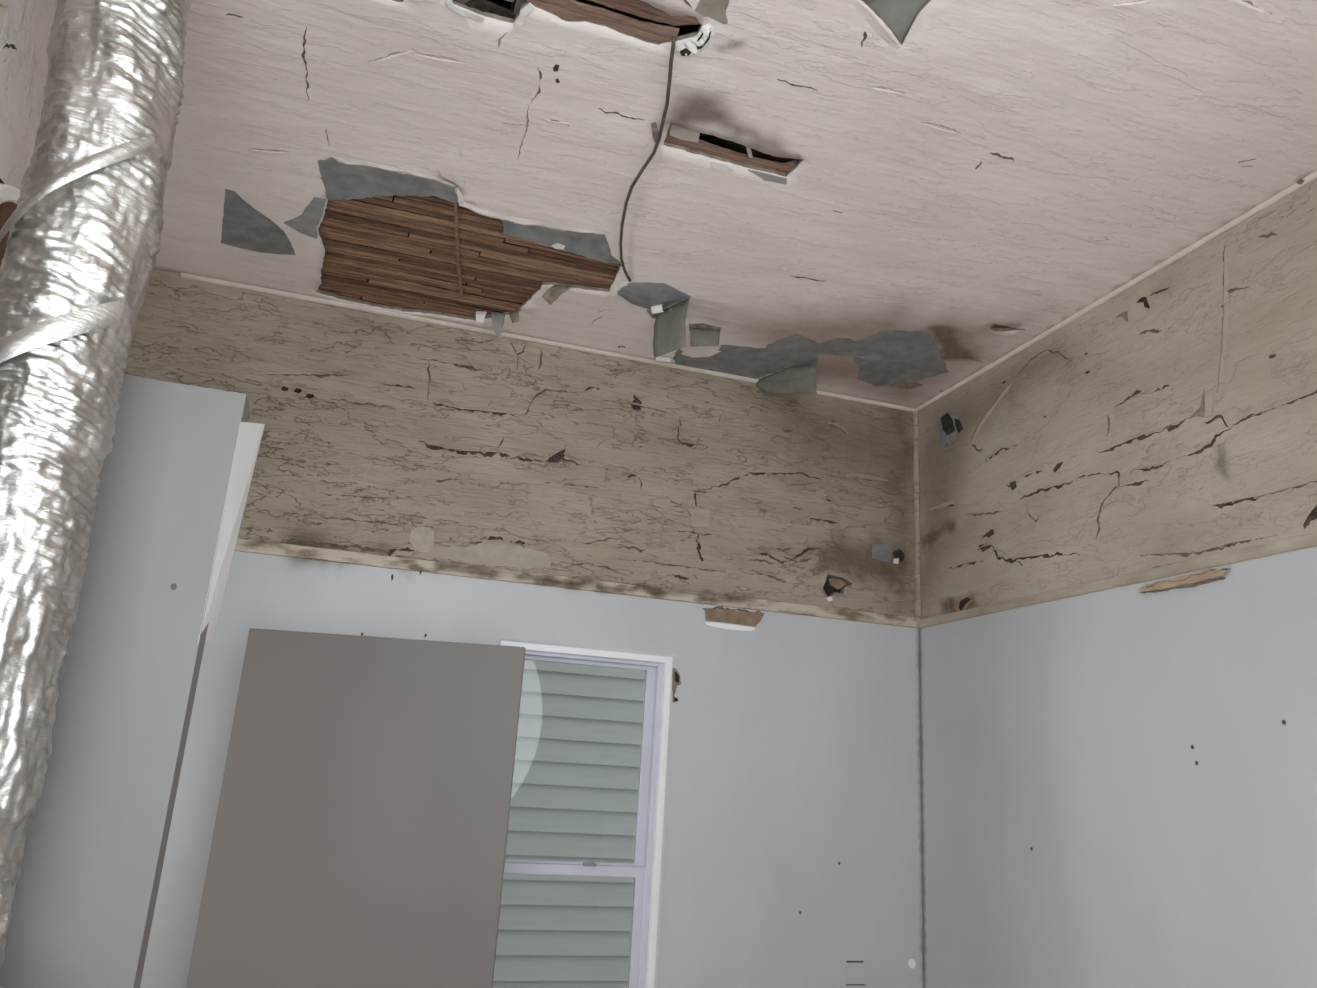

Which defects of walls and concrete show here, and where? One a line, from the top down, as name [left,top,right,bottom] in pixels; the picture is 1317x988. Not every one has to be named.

crack [301,27,309,100]
spalling [395,0,729,44]
peeling [853,0,926,49]
crack [503,64,569,157]
crack [599,108,642,120]
crack [975,153,1014,169]
flaking render [221,153,949,394]
crack [248,339,699,489]
crack [923,245,1317,572]
crack [290,489,422,581]
crack [563,466,888,583]
spalling [821,569,854,602]